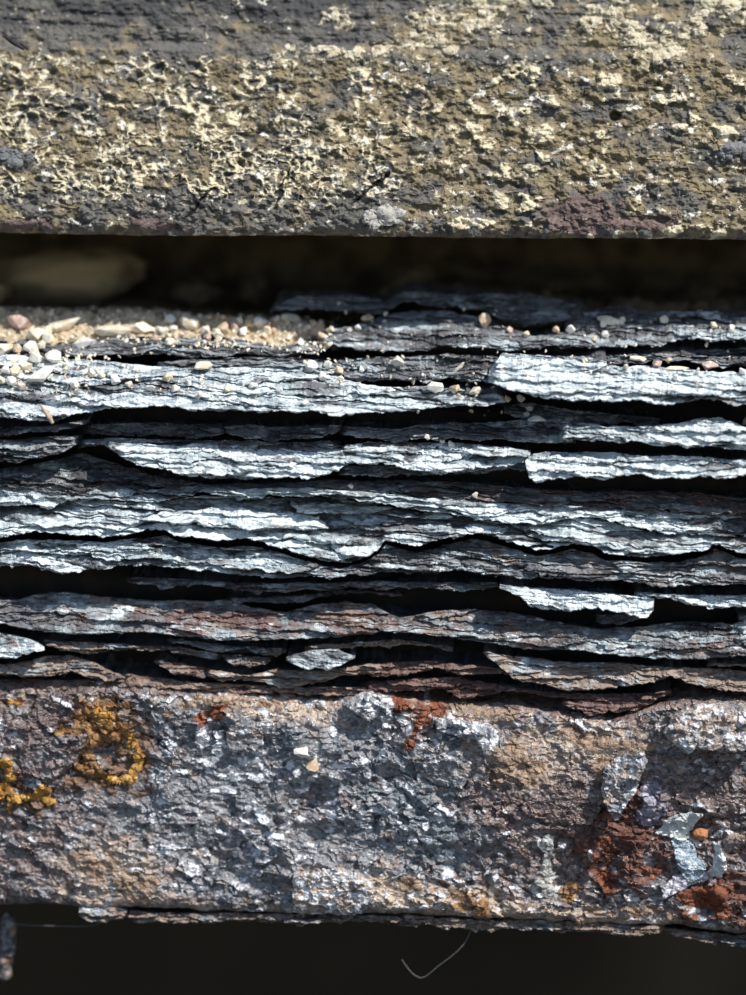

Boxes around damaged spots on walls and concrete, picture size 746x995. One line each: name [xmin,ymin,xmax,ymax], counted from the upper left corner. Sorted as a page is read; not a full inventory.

spalling [0,315,32,340]
spalling [48,317,80,333]
spalling [72,318,154,348]
spalling [254,317,267,328]
spalling [478,312,491,327]
spalling [597,315,625,326]
spalling [194,361,212,370]
spalling [702,361,718,370]
spalling [27,366,55,382]
spalling [427,382,481,395]
corrosion [0,282,746,819]
corrosion [71,788,746,948]